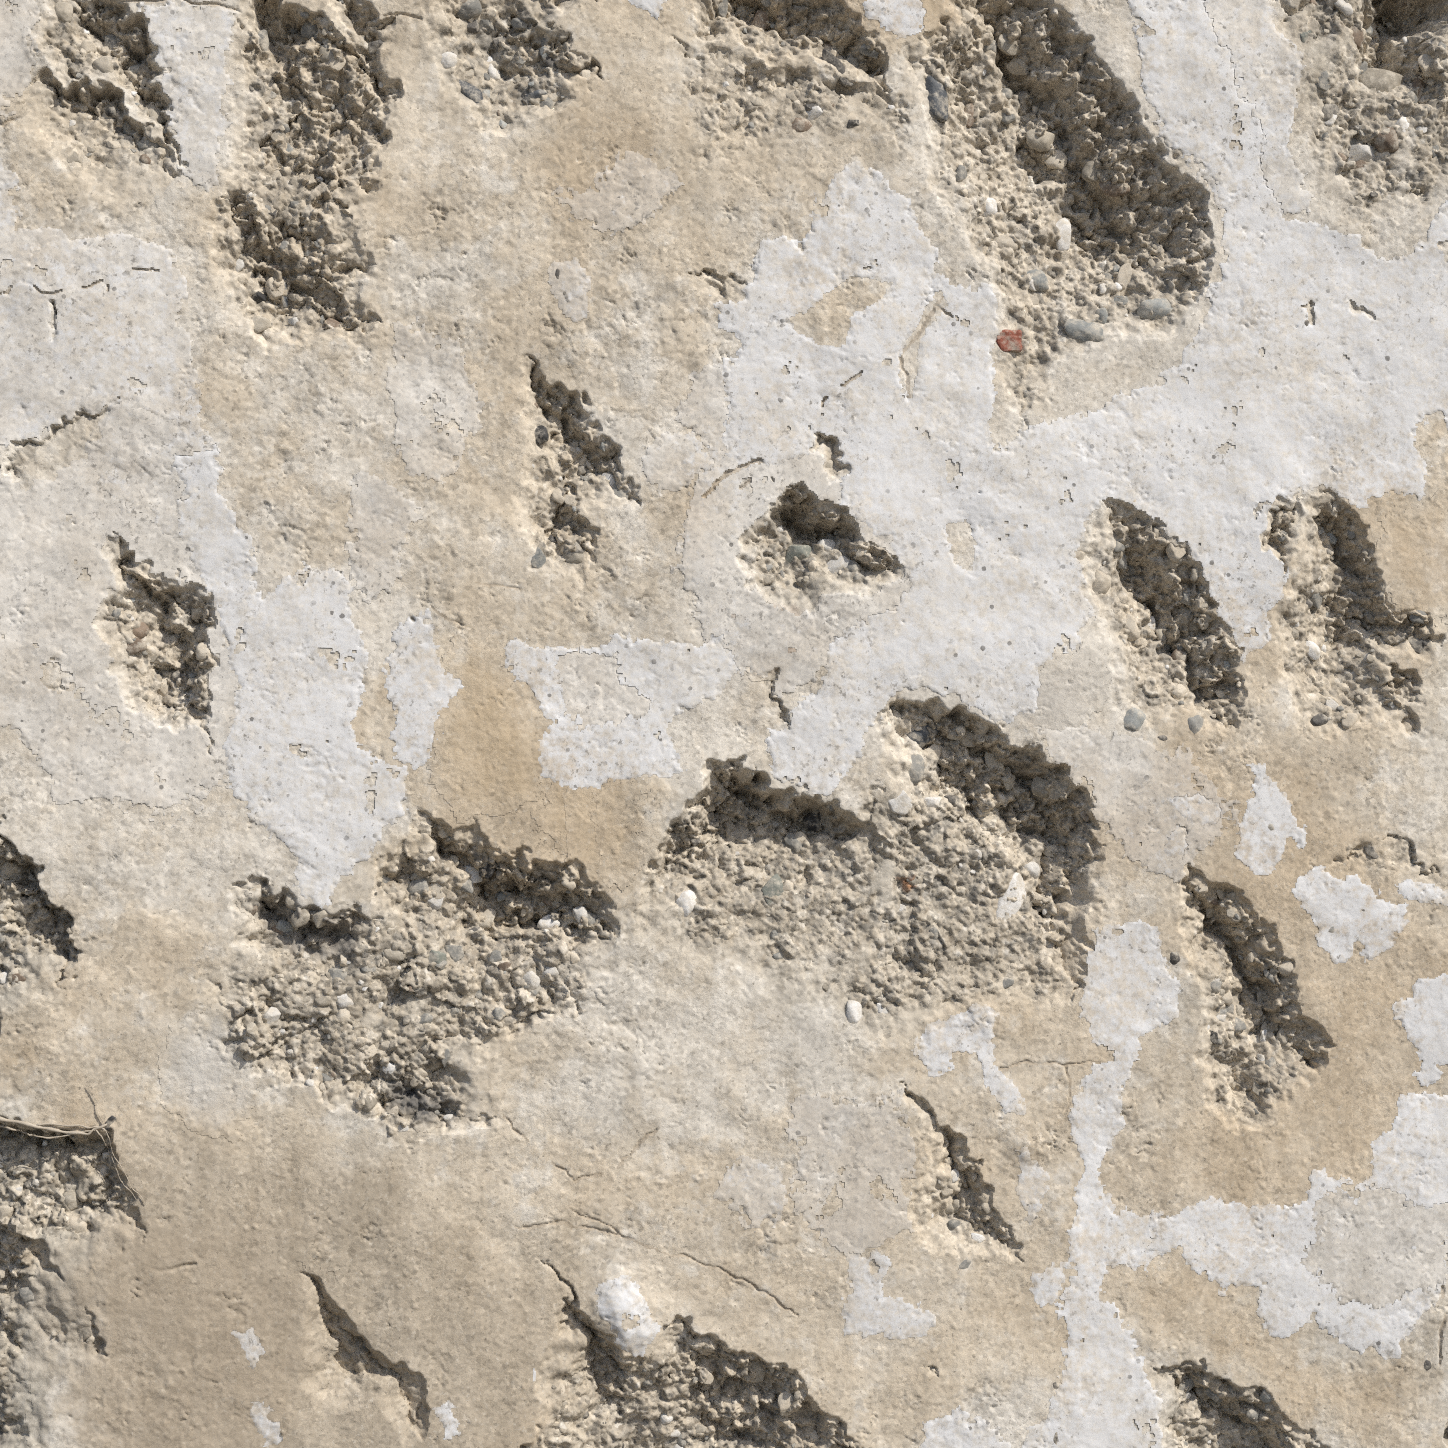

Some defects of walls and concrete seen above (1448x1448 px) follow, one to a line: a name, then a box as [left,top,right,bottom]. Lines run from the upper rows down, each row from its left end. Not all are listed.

spalling [422,0,610,137]
spalling [0,0,485,484]
peeling [0,158,464,936]
peeling [504,0,1448,1448]
spalling [0,814,83,1037]
spalling [208,809,621,1141]
spalling [0,1116,137,1448]
peeling [231,1327,265,1369]
peeling [250,1401,283,1448]
spalling [313,1278,461,1447]